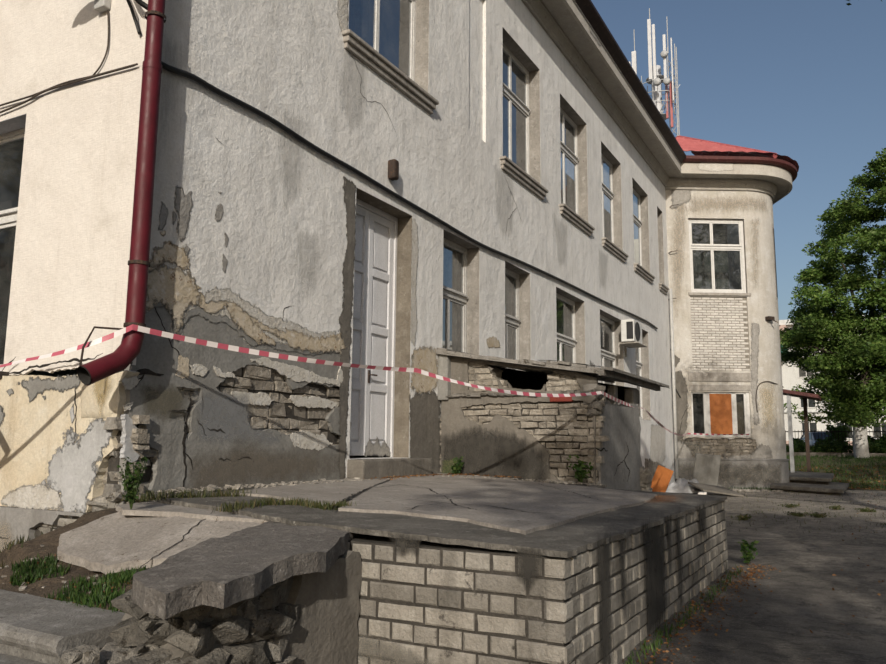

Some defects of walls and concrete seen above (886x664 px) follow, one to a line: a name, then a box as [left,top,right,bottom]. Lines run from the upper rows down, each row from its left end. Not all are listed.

flaking render [1,176,356,537]
peeling [364,437,391,458]
water stain [443,428,545,481]
crack [596,443,630,481]
crack [127,510,213,582]